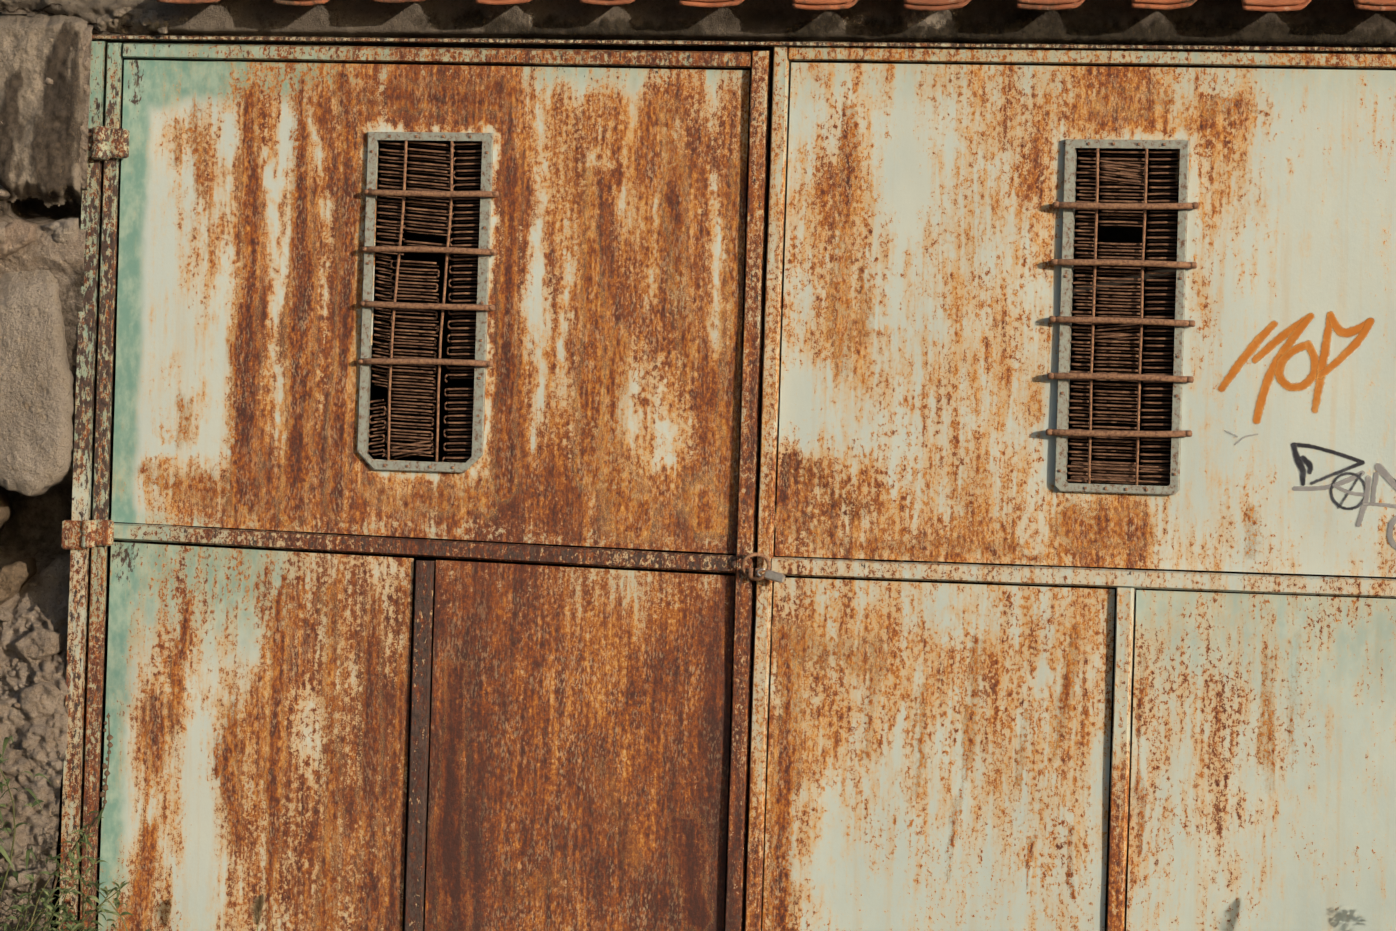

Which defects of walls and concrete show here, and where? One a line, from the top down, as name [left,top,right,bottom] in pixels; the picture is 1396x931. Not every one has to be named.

corrosion [138,69,525,528]
corrosion [571,167,661,544]
corrosion [677,158,742,539]
corrosion [828,102,875,375]
corrosion [774,449,1044,564]
corrosion [117,820,158,931]
corrosion [145,593,192,775]
corrosion [213,701,242,849]
corrosion [261,574,290,931]
corrosion [310,576,410,931]
corrosion [764,621,890,931]
corrosion [945,635,983,880]